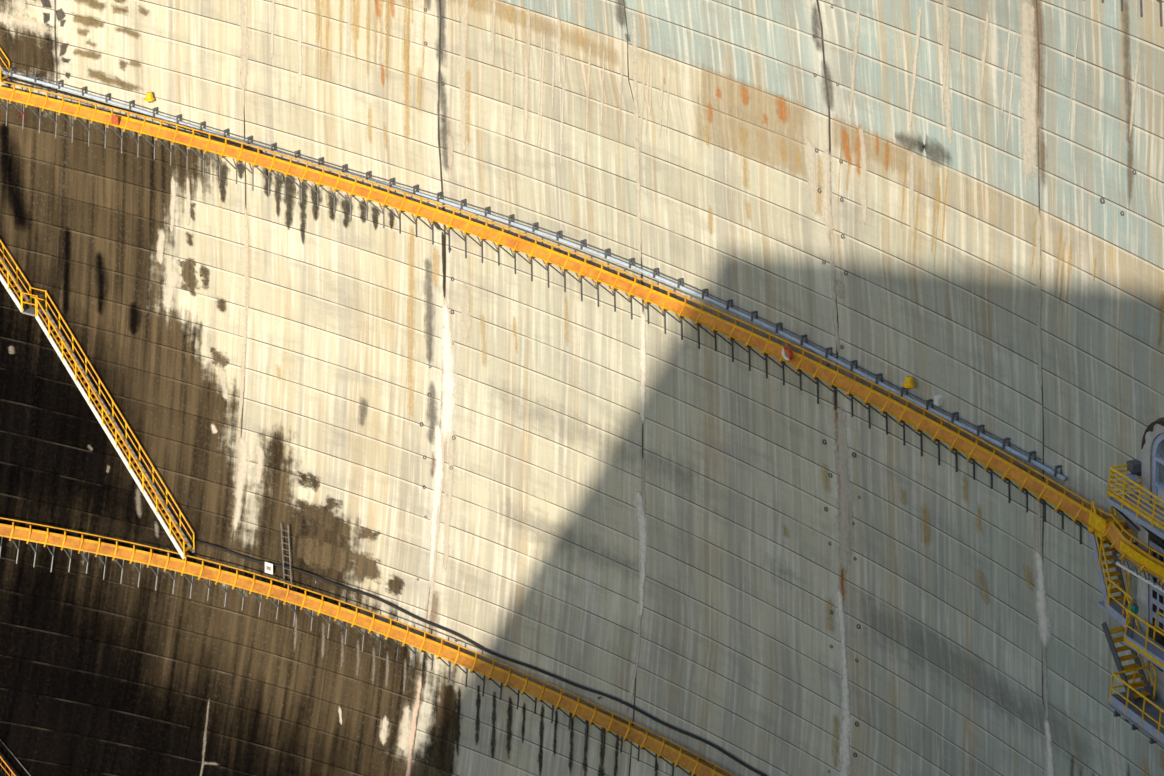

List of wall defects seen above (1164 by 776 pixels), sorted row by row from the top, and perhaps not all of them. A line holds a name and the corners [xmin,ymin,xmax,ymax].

water stain [426,0,468,168]
water stain [617,0,670,256]
corrosion [843,130,860,173]
water stain [0,0,461,776]
water stain [426,261,471,636]
water stain [628,457,647,710]
water stain [475,685,526,759]
water stain [538,704,619,776]
water stain [837,588,850,776]